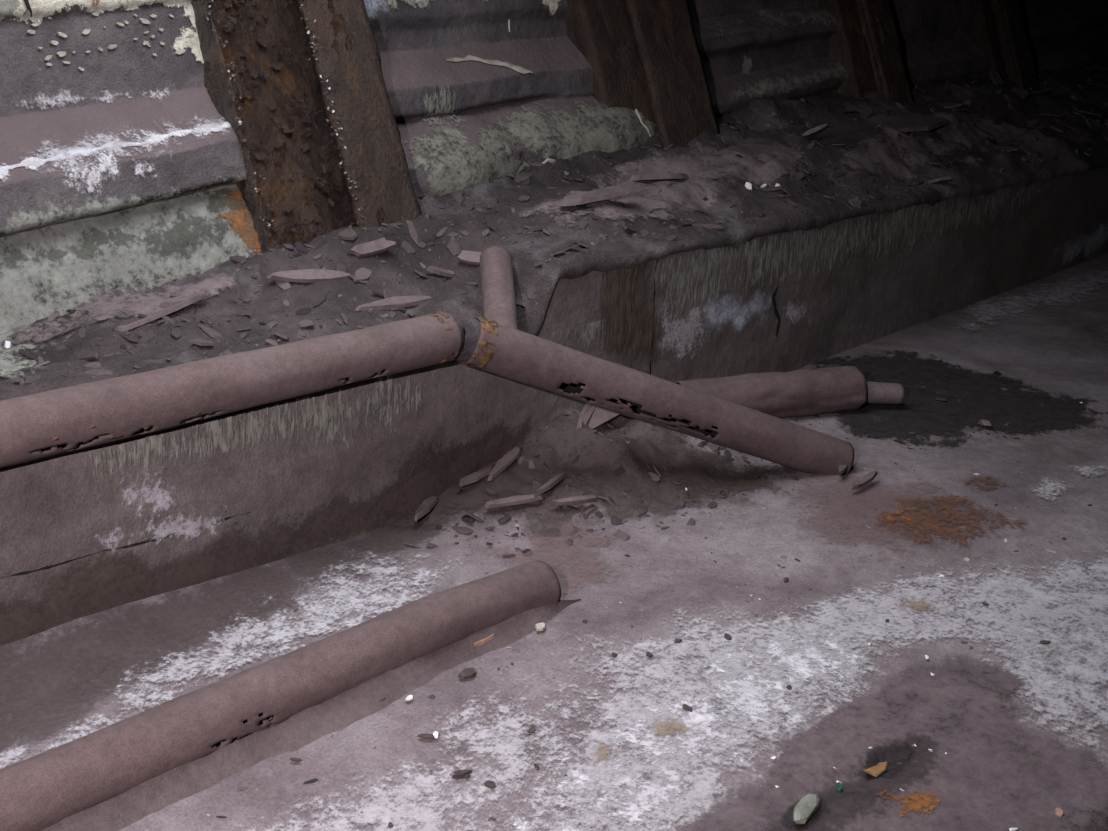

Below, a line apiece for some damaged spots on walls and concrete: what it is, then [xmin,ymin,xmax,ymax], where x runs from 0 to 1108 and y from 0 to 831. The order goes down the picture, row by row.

water stain [0,117,258,378]
water stain [812,350,1108,447]
crack [2,533,175,578]
water stain [0,375,800,768]
water stain [248,558,1108,831]